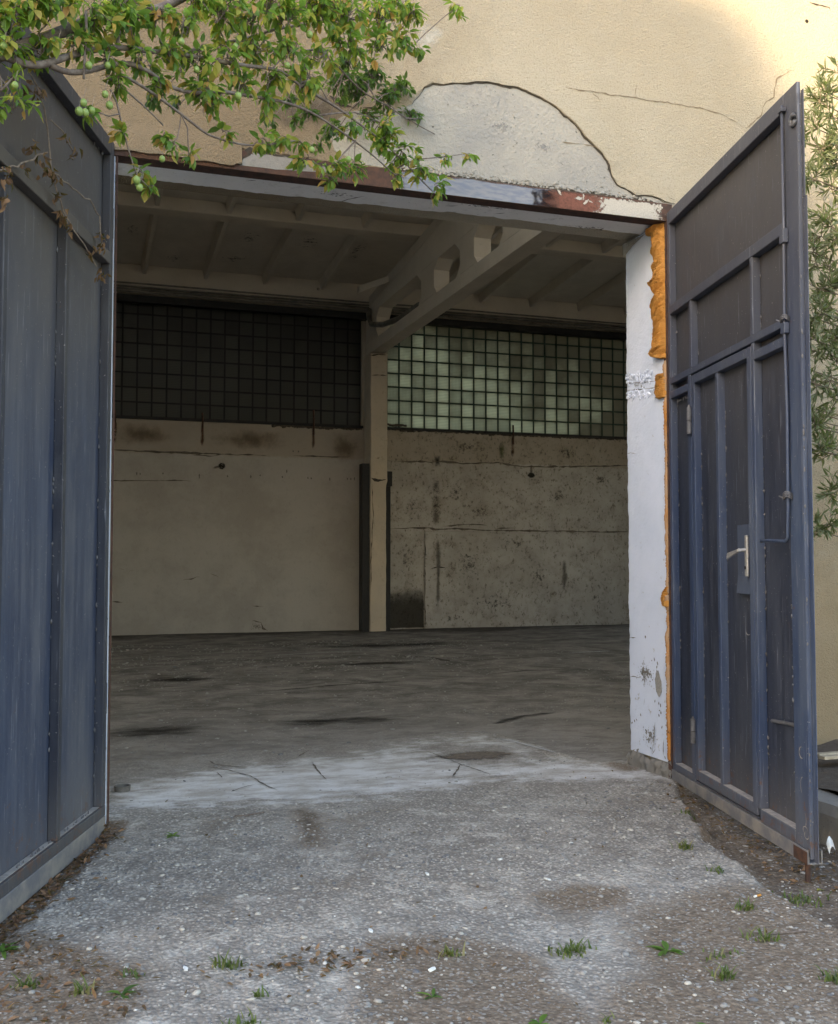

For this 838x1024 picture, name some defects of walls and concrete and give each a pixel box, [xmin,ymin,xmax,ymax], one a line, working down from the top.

flaking render [331,83,674,214]
rust [532,189,619,213]
crack [412,65,795,204]
spalling [632,594,671,762]
crack [210,761,277,792]